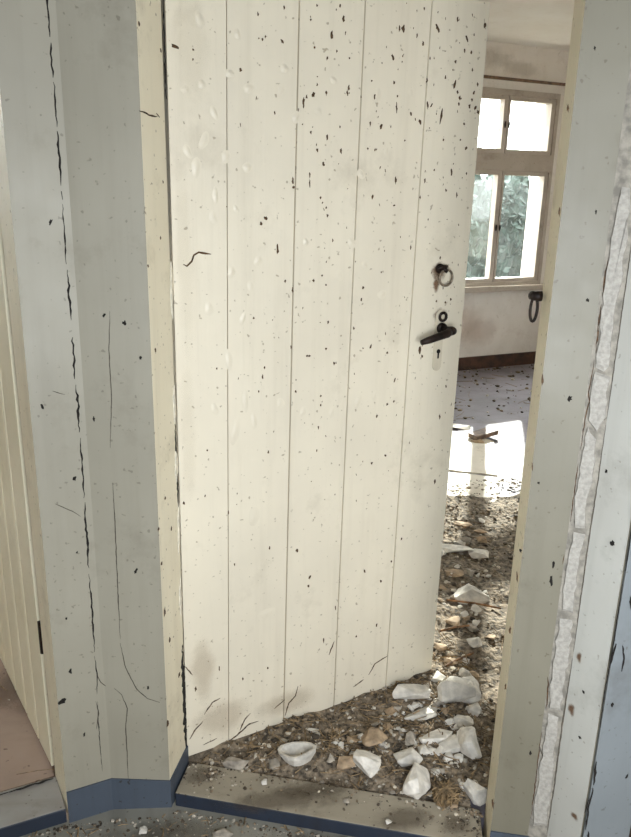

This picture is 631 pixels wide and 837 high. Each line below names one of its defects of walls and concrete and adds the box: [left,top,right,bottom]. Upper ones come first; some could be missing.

crack [46,0,72,316]
crack [140,0,167,118]
crack [53,322,160,769]
crack [180,645,188,747]